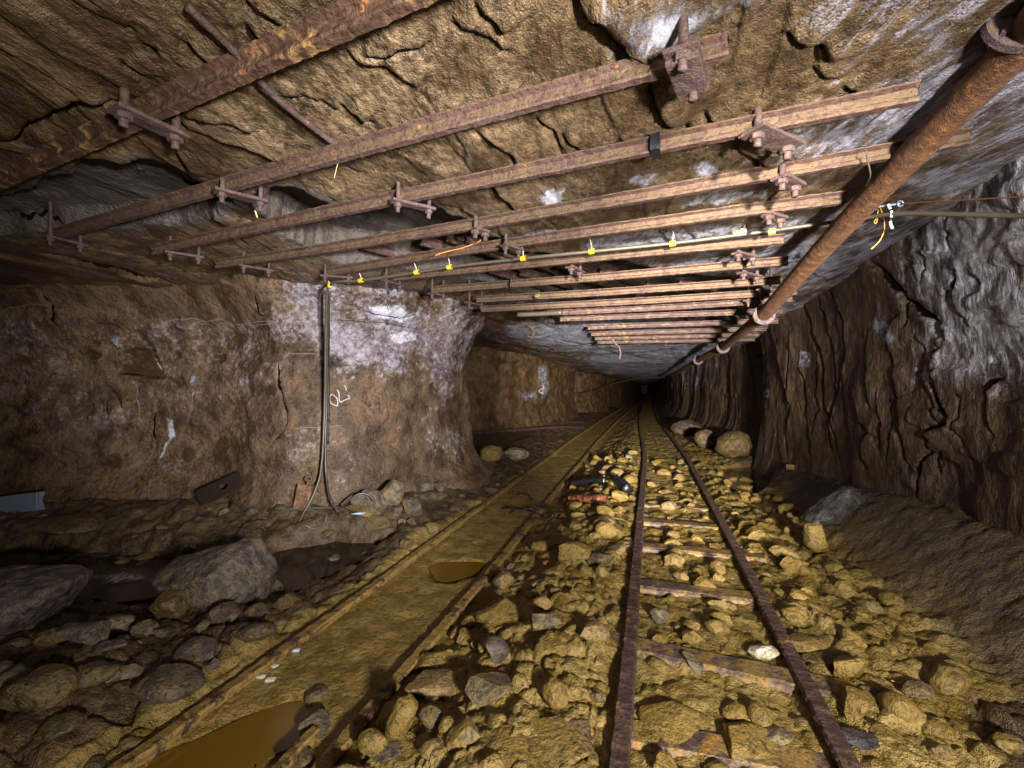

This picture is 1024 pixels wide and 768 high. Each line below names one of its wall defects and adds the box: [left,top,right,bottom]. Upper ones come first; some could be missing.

crack [451,5,508,50]
crack [346,40,432,88]
leakage [369,304,417,344]
crack [776,312,960,490]
crack [983,378,1001,435]